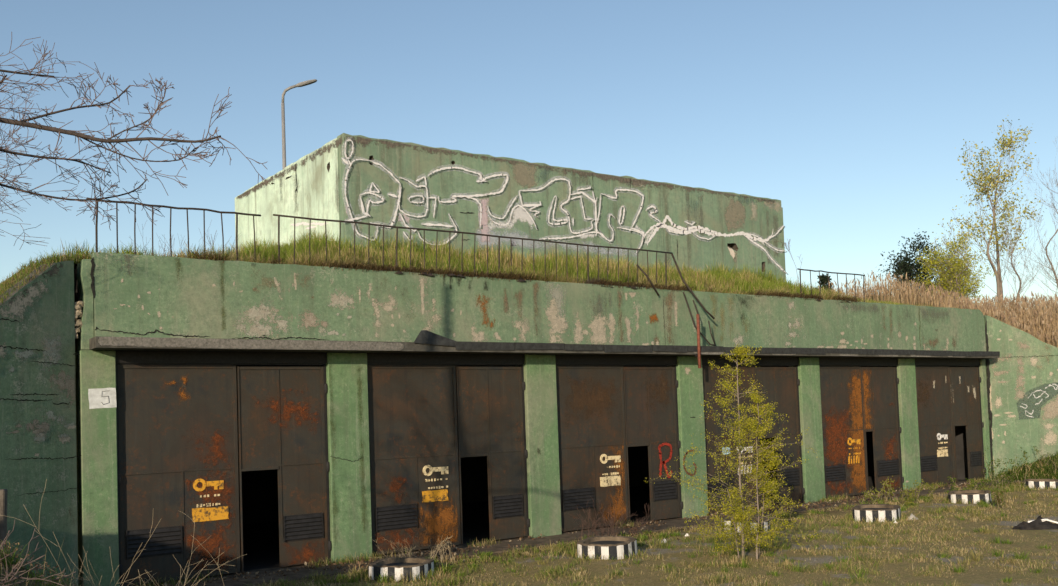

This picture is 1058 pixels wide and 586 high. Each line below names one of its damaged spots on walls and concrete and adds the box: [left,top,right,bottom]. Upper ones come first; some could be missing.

crack [88,257,96,298]
crack [0,318,80,366]
crack [95,327,328,340]
peeling [543,291,659,345]
crack [0,393,70,405]
rust [823,370,872,494]
rust [182,432,234,571]
rust [375,499,458,551]
rust [601,445,626,521]